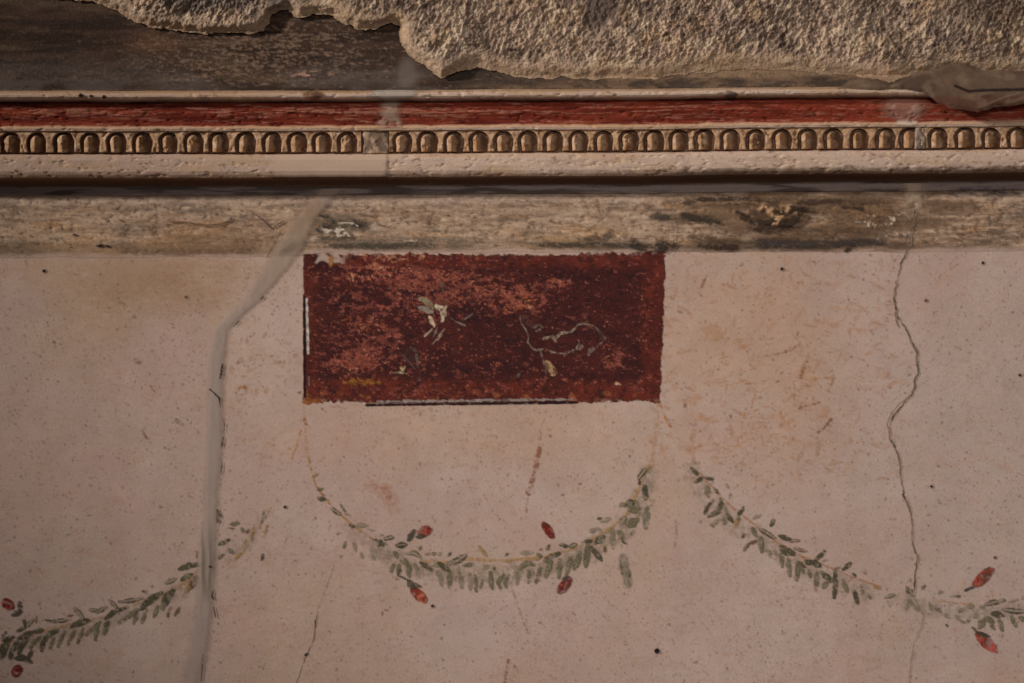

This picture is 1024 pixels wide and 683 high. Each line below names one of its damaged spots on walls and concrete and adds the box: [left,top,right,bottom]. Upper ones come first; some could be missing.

flaking render [75,0,1024,83]
crack [887,210,920,590]